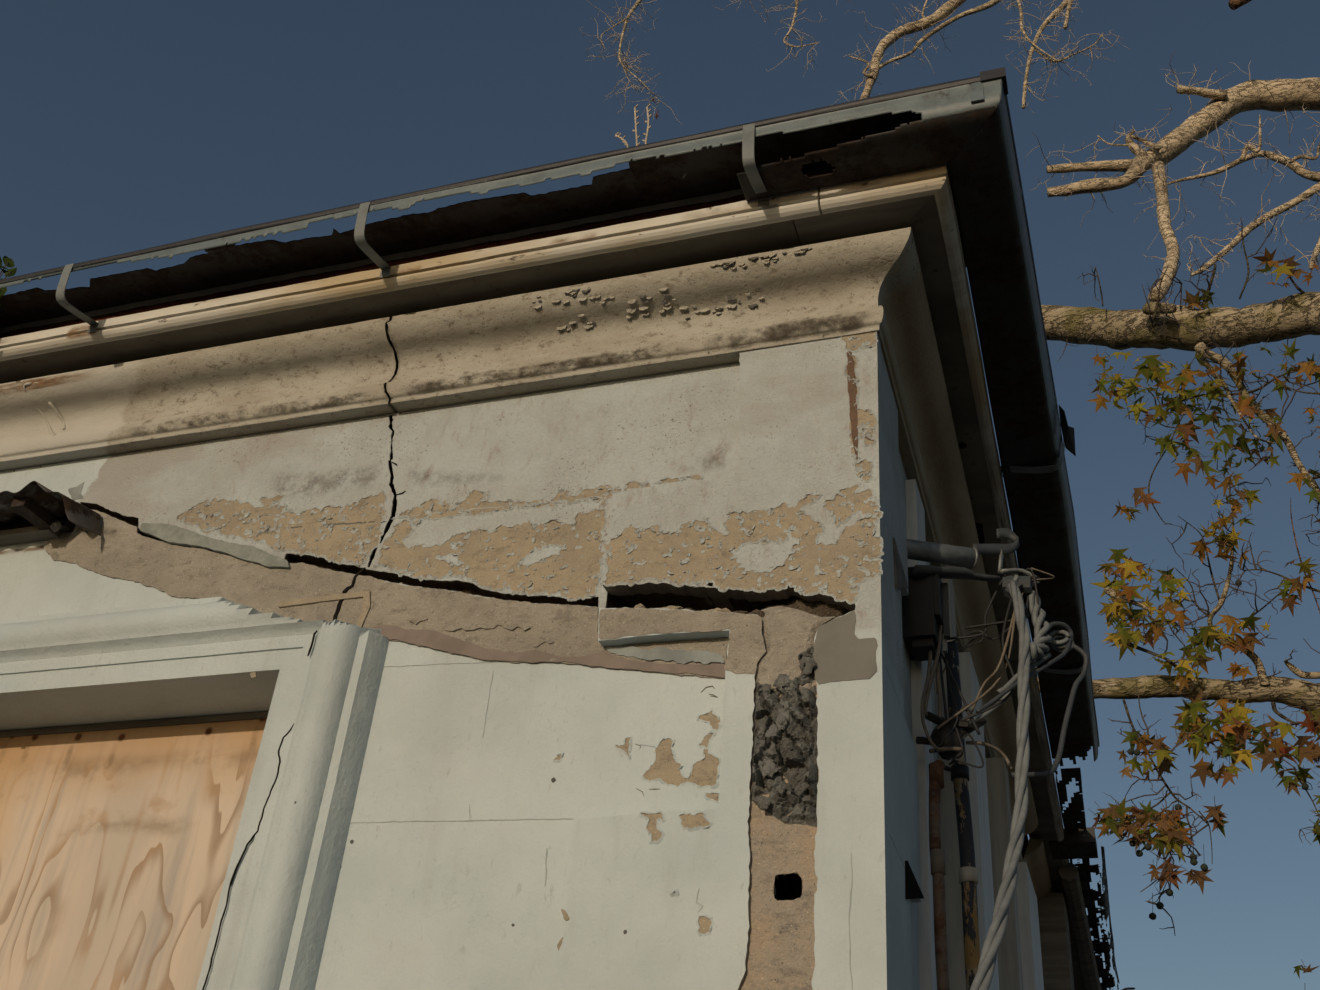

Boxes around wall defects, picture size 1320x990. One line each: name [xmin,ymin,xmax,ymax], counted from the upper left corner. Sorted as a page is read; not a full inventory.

crack [80,407,603,656]
spalling [44,331,884,679]
crack [202,724,294,990]
peeling [614,736,633,761]
peeling [639,708,722,845]
flaking render [740,762,818,990]